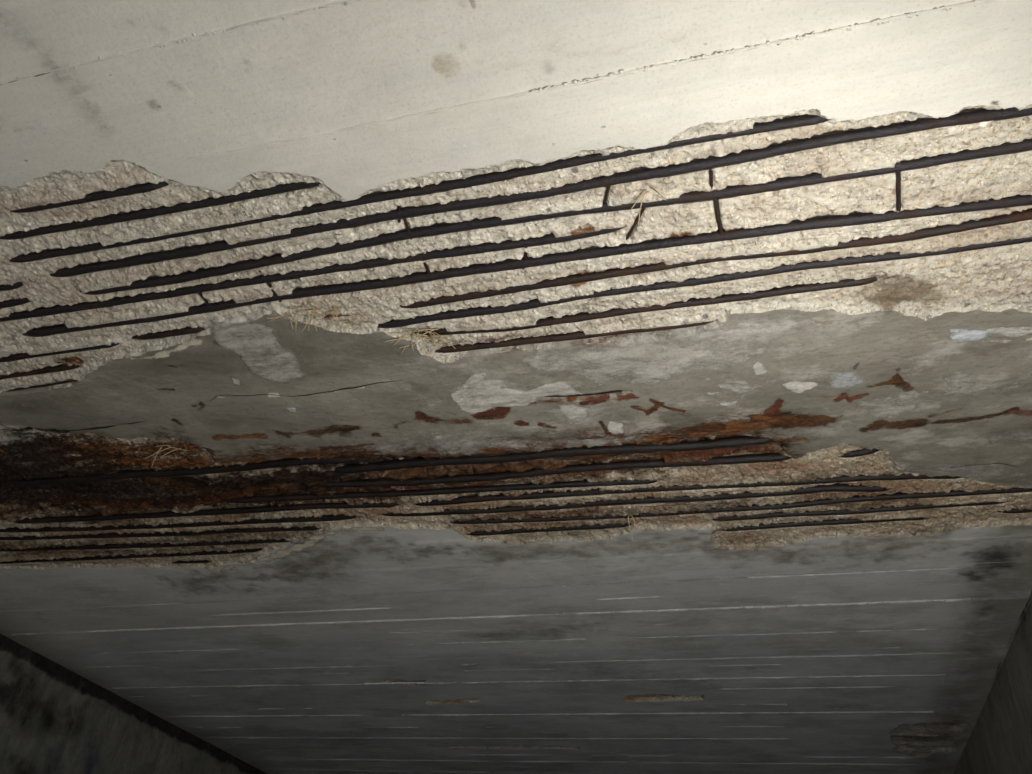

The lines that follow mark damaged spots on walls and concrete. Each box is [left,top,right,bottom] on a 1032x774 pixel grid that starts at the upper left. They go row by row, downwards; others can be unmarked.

spalling [0,104,1032,424]
rust [528,392,686,415]
rust [834,369,913,402]
rust [860,407,1032,432]
rust [0,399,835,525]
spalling [0,421,1032,569]
spalling [888,717,972,759]